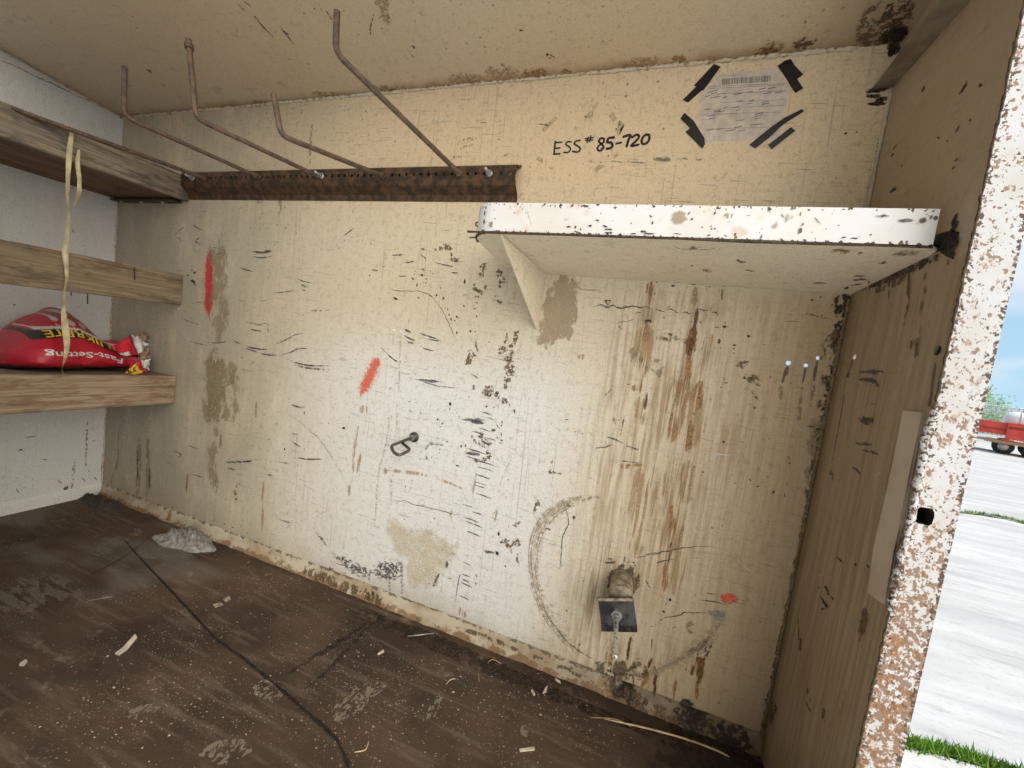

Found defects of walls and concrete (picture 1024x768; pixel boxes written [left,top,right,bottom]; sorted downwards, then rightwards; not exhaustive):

rust [451,63,547,83]
rust [932,0,1024,410]
rust [620,281,725,594]
crack [90,536,350,768]
leakage [317,533,403,593]
leakage [290,610,764,768]
leakage [528,497,598,658]
rust [598,637,658,698]
rust [691,642,712,699]
rust [853,611,890,768]